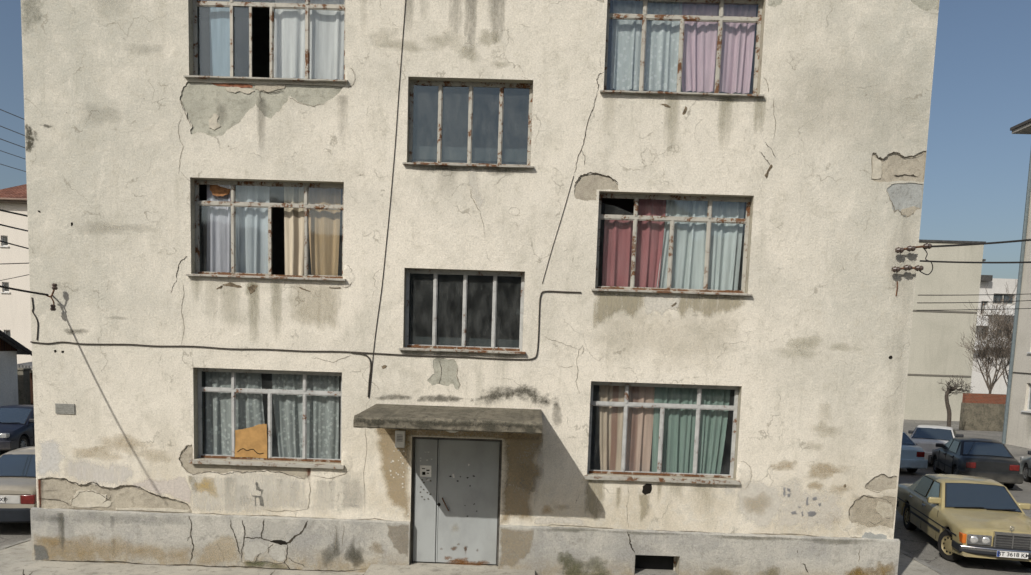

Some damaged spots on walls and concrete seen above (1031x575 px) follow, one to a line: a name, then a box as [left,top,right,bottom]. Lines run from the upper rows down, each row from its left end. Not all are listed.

spalling [180,82,343,137]
crack [575,73,602,172]
flaking render [574,172,619,201]
spalling [871,151,926,217]
flaking render [427,358,461,390]
mould [481,386,548,403]
mould [355,419,540,433]
spalling [38,477,192,513]
crack [47,435,389,572]
flaking render [848,474,897,529]